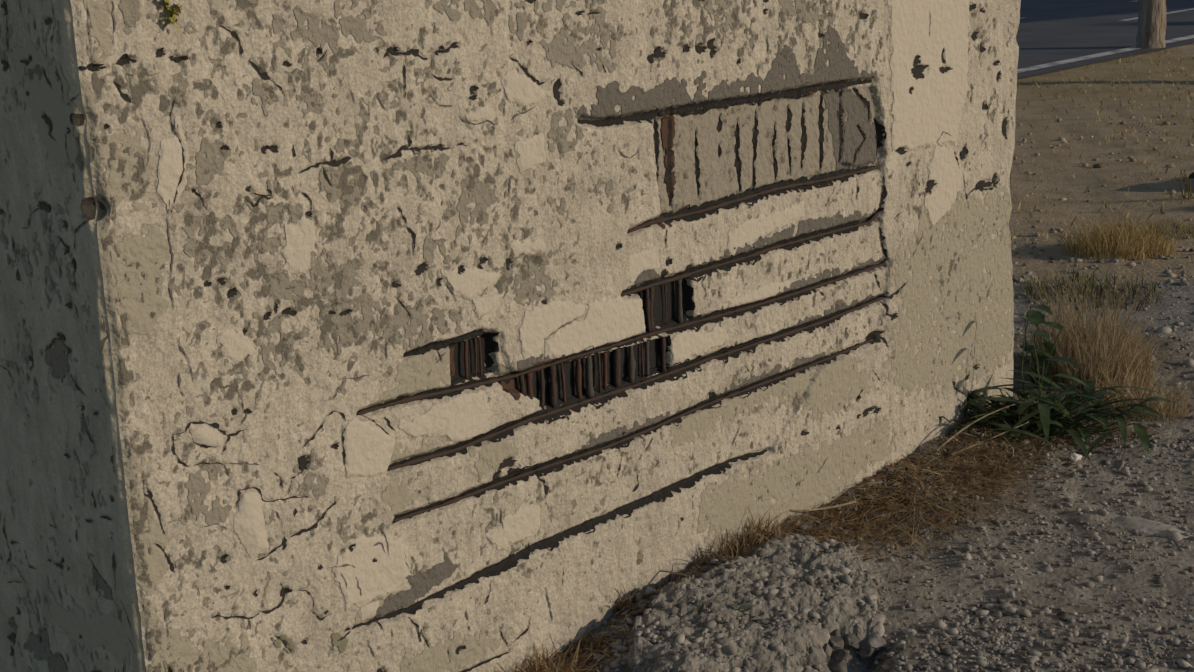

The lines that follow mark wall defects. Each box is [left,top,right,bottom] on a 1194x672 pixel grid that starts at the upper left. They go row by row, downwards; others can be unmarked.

peeling [0,0,60,72]
crack [3,1,411,573]
crack [397,206,441,255]
crack [340,46,545,160]
spalling [64,0,1018,672]
rust [356,262,887,415]
rust [661,109,676,195]
rust [627,165,880,234]
spalling [2,318,117,535]
rust [387,297,883,524]
spalling [7,532,119,672]
crack [500,572,564,651]